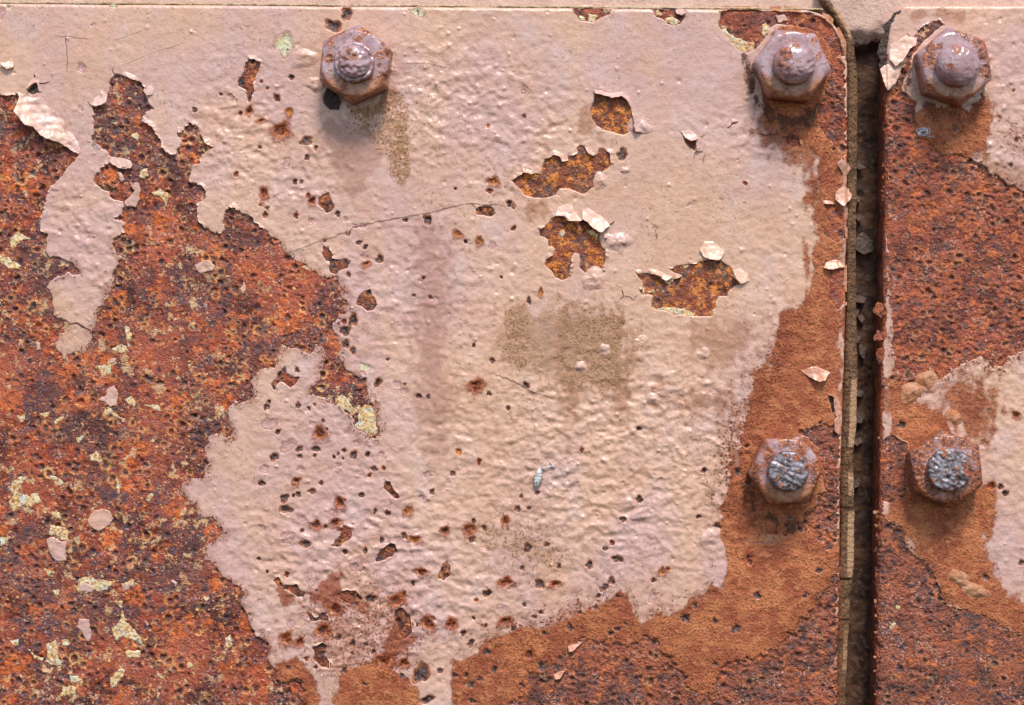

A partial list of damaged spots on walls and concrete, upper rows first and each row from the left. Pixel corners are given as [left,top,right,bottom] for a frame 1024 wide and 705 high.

peeling [0,71,498,705]
peeling [219,55,318,161]
corrosion [180,235,436,705]
crack [291,203,500,252]
peeling [474,90,644,280]
corrosion [450,25,845,705]
peeling [635,241,751,317]
peeling [824,9,1024,386]
corrosion [881,243,1023,452]
corrosion [888,467,1024,636]
corrosion [915,94,1024,191]